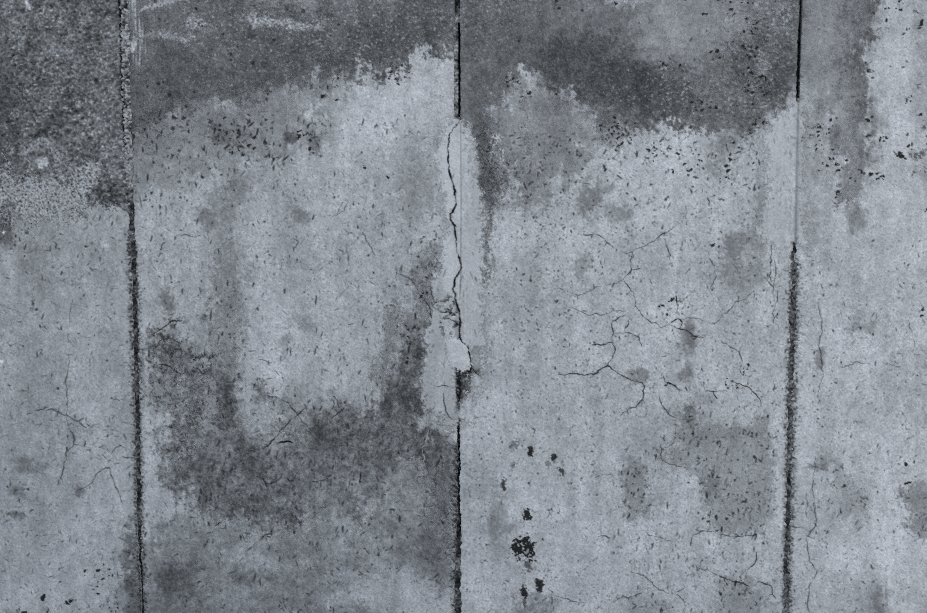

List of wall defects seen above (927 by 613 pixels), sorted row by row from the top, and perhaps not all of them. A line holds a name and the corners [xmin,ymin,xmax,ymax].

water stain [0,136,105,232]
water stain [128,0,806,243]
water stain [831,0,879,122]
crack [396,125,479,466]
crack [559,228,778,417]
water stain [161,314,458,534]
water stain [149,554,204,611]